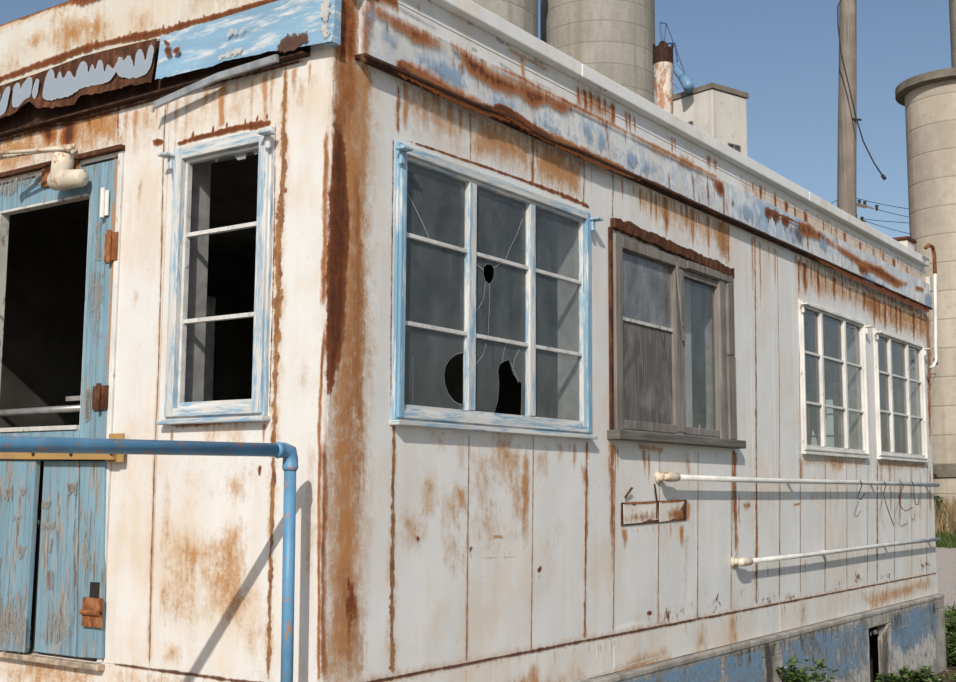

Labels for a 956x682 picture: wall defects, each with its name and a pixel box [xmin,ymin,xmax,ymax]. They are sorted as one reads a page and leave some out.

peeling [0,40,180,116]
corrosion [0,0,278,82]
peeling [218,47,242,60]
peeling [277,31,308,53]
peeling [320,0,332,39]
corrosion [177,60,311,443]
corrosion [317,0,729,679]
corrosion [367,238,936,682]
corrosion [115,455,276,682]
peeling [626,648,765,682]
peeling [777,603,938,682]